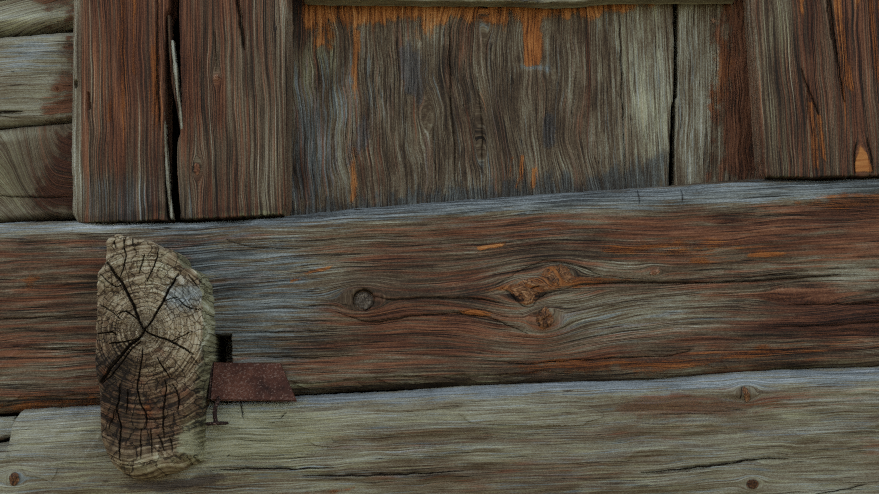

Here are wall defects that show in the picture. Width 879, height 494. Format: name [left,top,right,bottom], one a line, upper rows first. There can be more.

crack [4,236,199,461]